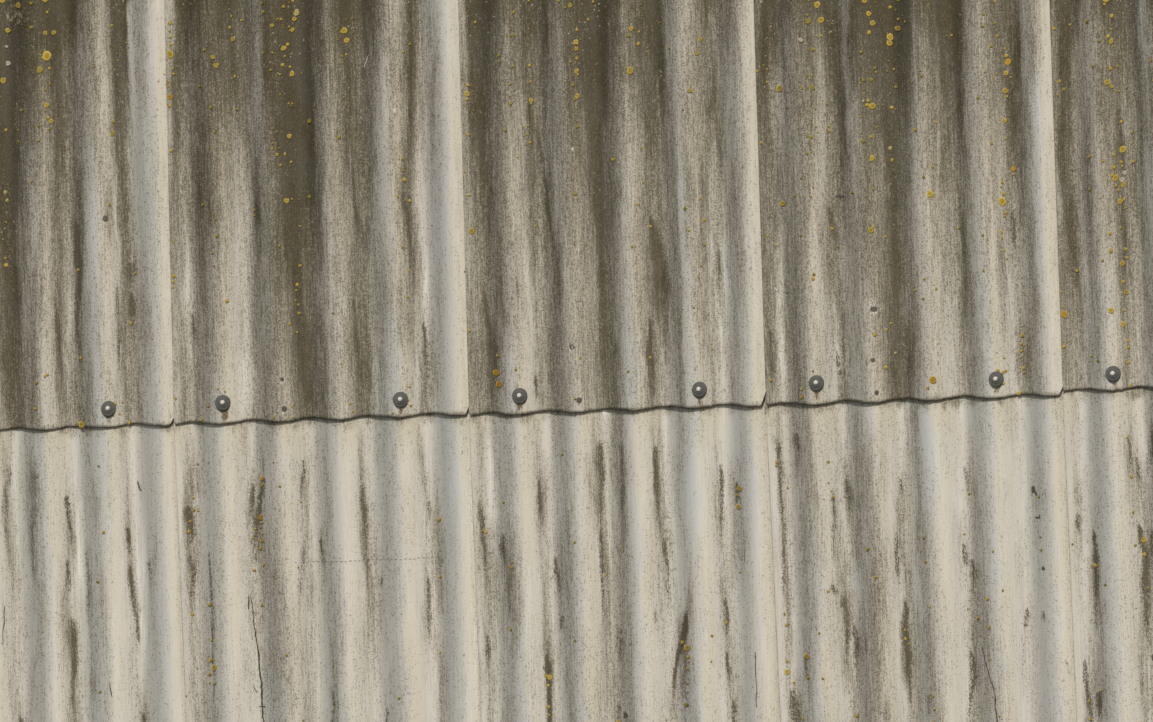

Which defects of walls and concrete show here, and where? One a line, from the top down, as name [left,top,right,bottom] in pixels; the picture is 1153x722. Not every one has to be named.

leakage [53,222,83,412]
leakage [125,528,140,641]
leakage [182,506,214,696]
crack [248,596,265,722]
leakage [297,485,401,615]
leakage [543,654,553,722]
leakage [596,443,606,620]
leakage [652,447,670,599]
leakage [671,610,691,722]
leakage [899,600,913,703]
leakage [1075,515,1101,628]
leakage [1137,524,1153,637]